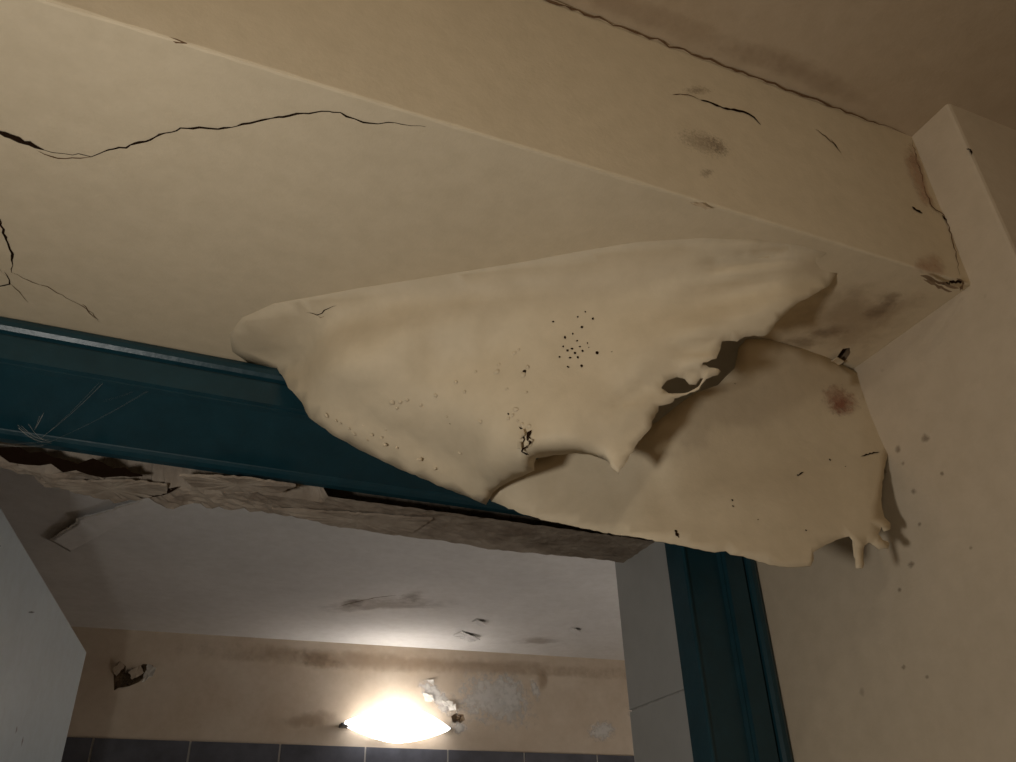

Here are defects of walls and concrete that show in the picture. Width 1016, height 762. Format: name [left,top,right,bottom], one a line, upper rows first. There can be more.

crack [0,111,425,159]
crack [546,0,960,274]
crack [0,220,96,318]
peeling [0,339,891,569]
spalling [112,661,156,690]
peeling [422,675,526,733]